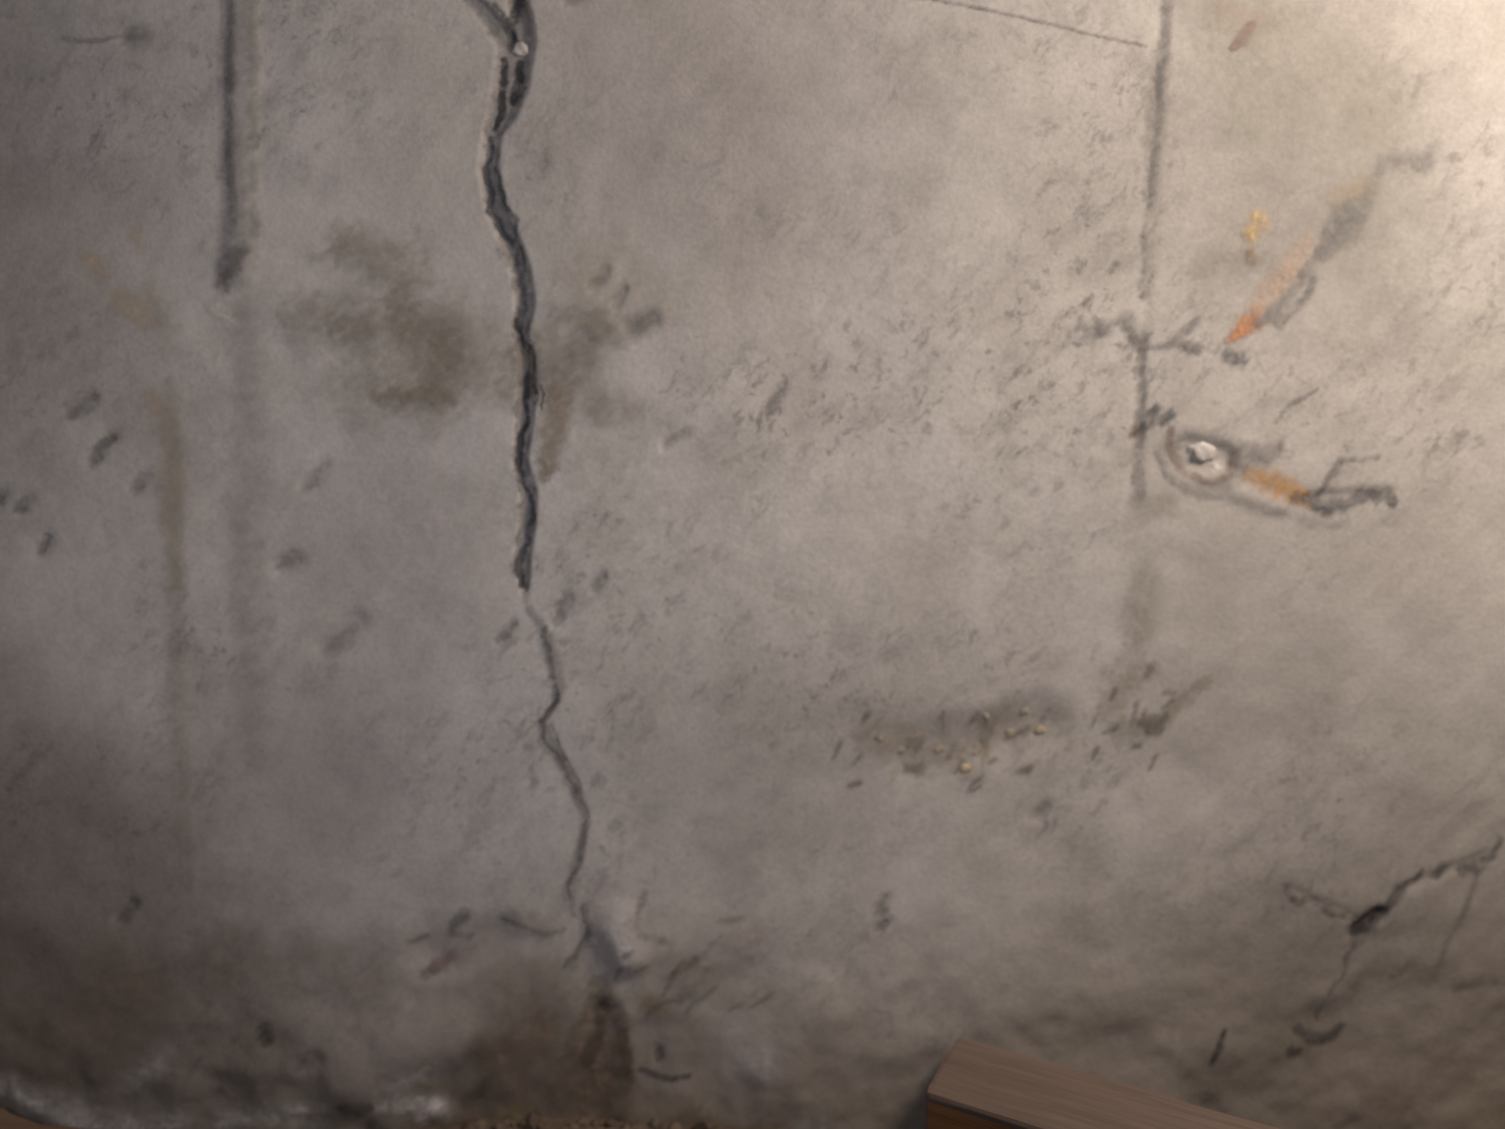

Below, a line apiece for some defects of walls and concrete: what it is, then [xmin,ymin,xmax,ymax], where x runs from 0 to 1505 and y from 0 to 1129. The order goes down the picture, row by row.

crack [945,0,1143,45]
crack [1086,318,1201,352]
crack [1282,388,1318,416]
crack [465,0,589,967]
corrosion [1245,472,1311,506]
crack [1303,455,1399,513]
crack [1284,841,1501,1053]
leakage [214,1073,447,1129]